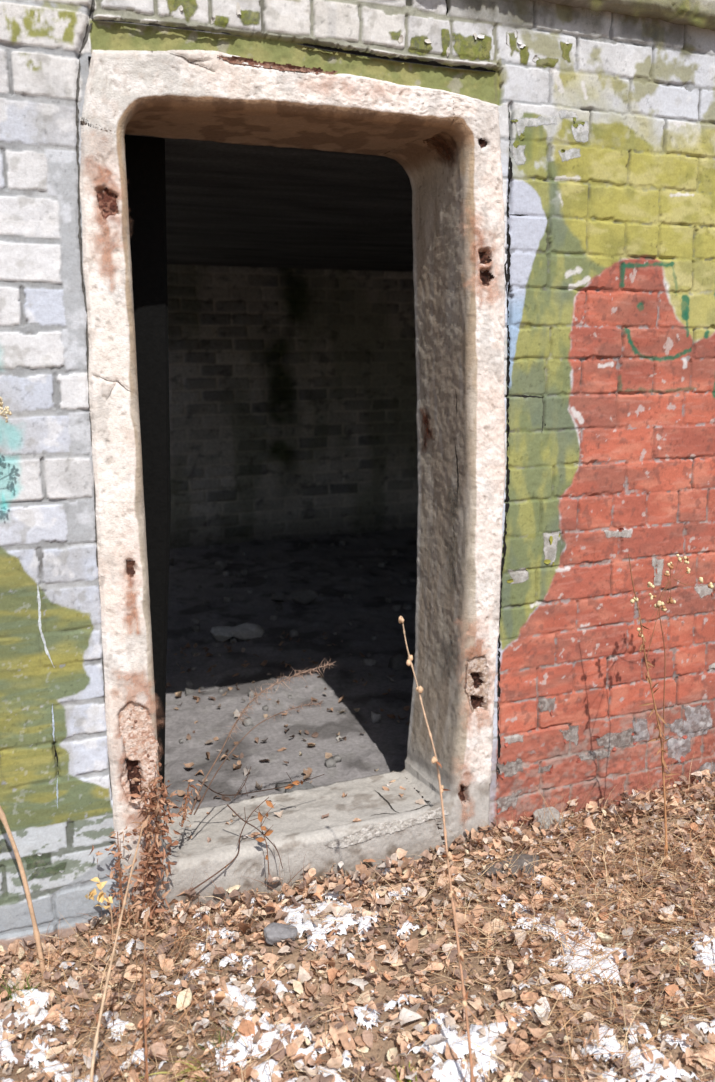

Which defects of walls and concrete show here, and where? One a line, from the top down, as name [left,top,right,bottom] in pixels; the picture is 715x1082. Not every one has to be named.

crack [299,43,496,72]
corrosion [97,167,121,200]
corrosion [96,206,113,272]
crack [76,0,242,446]
crack [496,106,546,779]
crack [93,481,101,604]
corrosion [126,574,139,634]
spalling [118,702,159,808]
peeling [664,703,712,764]
peeling [695,762,715,783]
peeling [0,839,12,853]
peeling [24,853,66,881]